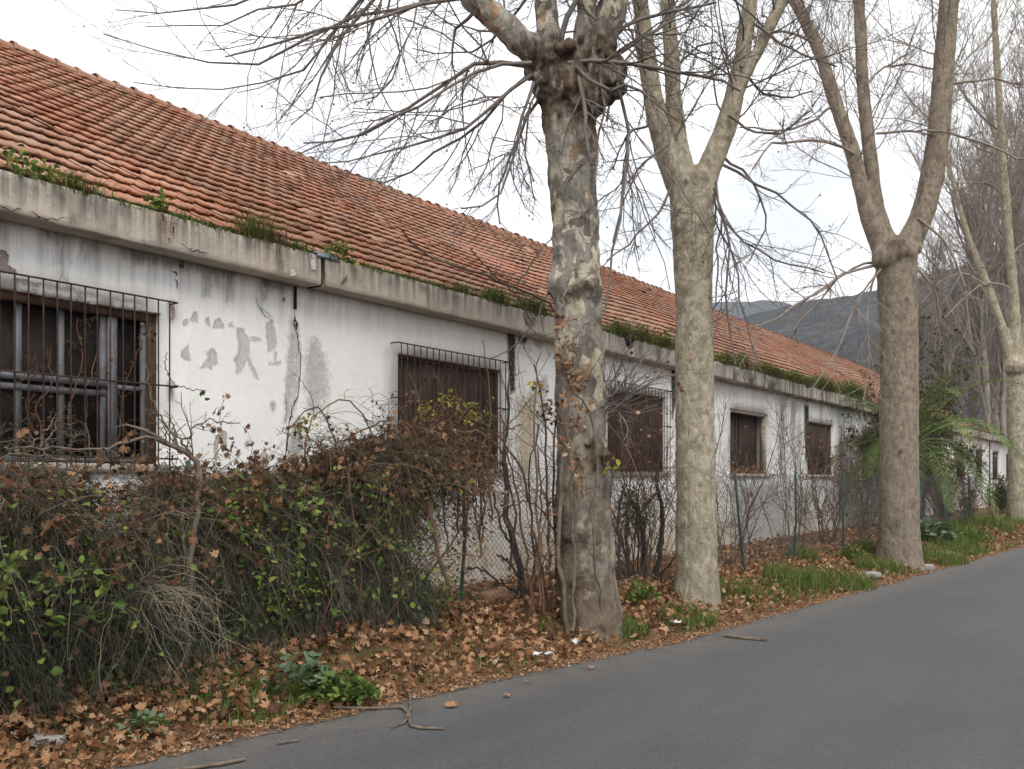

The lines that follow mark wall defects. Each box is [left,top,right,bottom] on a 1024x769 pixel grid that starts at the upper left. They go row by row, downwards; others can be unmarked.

peeling [183,296,302,456]
crack [285,316,301,455]
leakage [307,339,328,408]